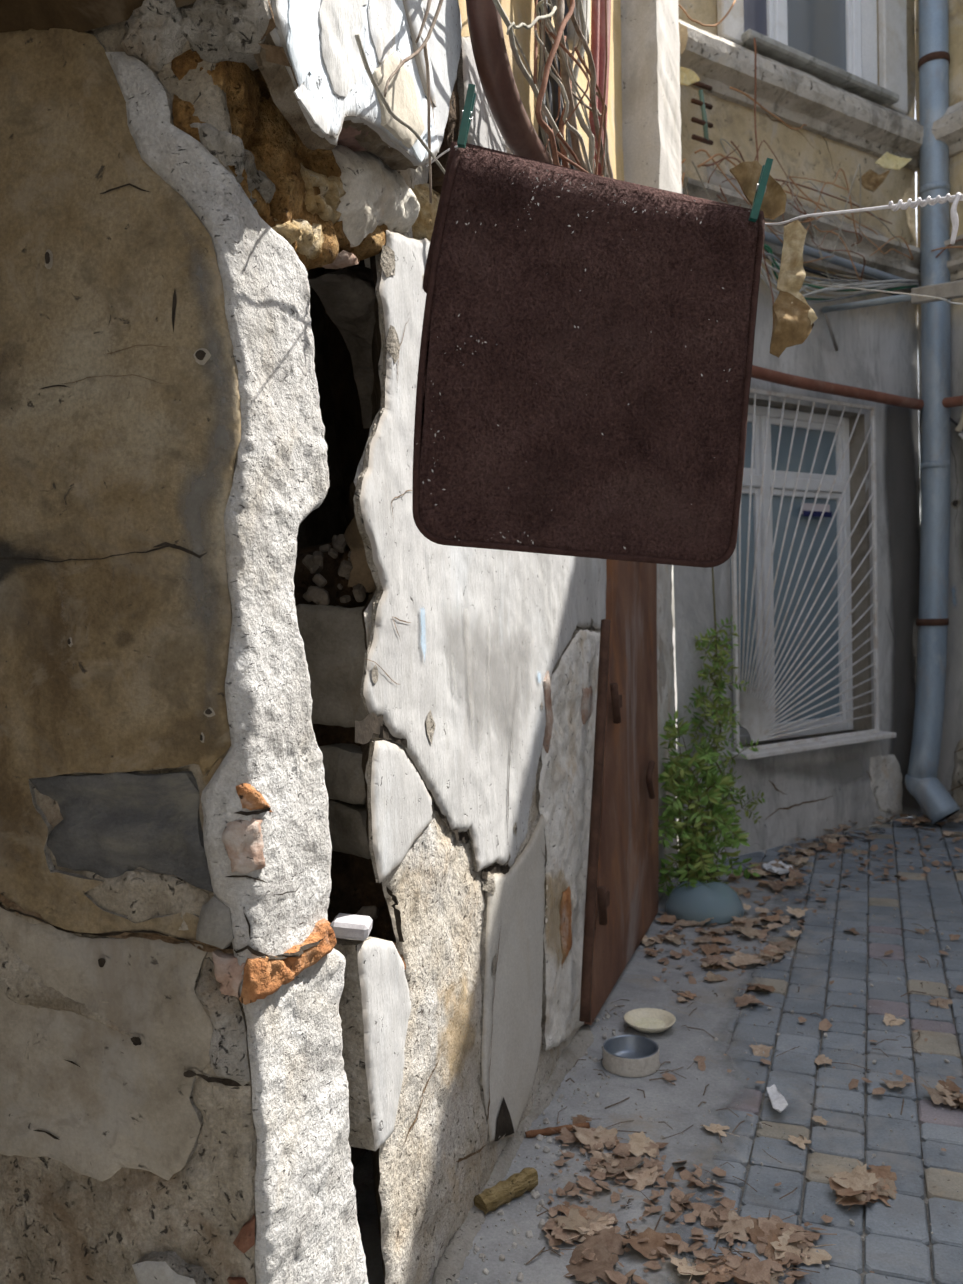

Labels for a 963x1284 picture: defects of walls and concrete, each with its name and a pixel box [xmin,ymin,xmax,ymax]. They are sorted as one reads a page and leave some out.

crack [258,0,298,87]
crack [323,260,365,274]
crack [41,290,177,389]
flaking render [0,0,440,1284]
crack [0,310,518,1162]
flaking render [948,738,963,818]